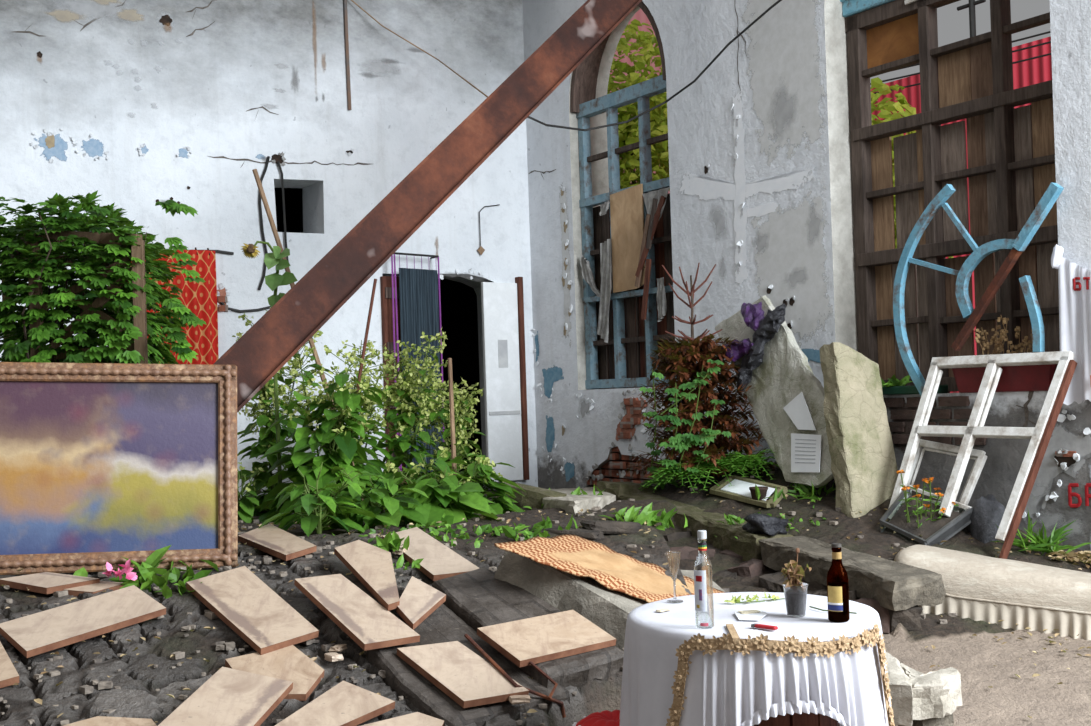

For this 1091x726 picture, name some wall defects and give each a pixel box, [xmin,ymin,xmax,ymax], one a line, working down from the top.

peeling [30,128,109,163]
peeling [531,329,564,403]
spalling [542,389,664,488]
peeling [1022,410,1091,534]